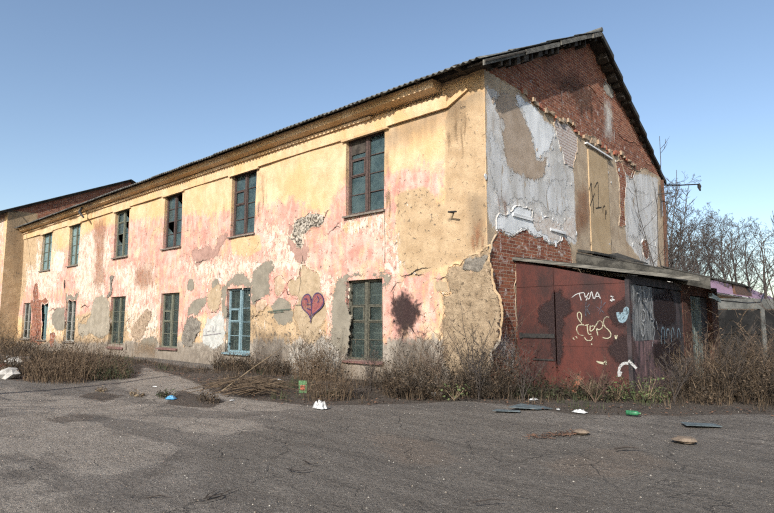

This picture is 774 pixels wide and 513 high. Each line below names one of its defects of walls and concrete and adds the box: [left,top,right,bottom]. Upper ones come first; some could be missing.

flaking render [77,269,114,342]
flaking render [131,308,158,346]
spalling [181,211,396,375]
spalling [430,66,657,387]